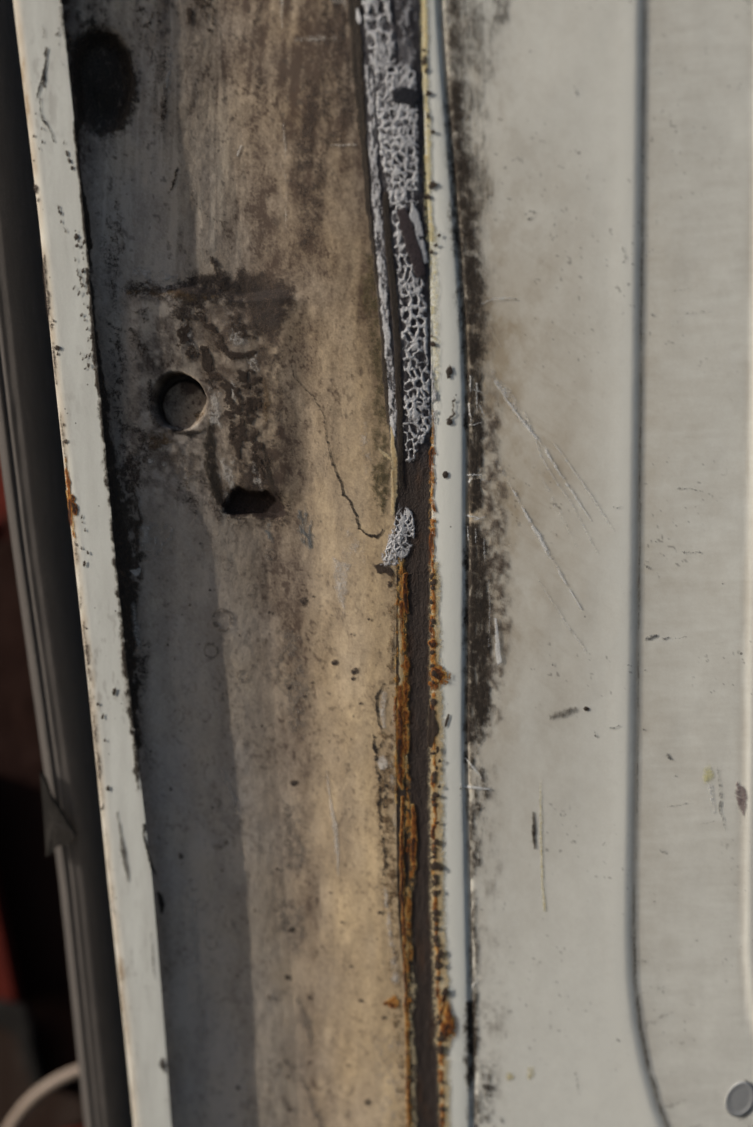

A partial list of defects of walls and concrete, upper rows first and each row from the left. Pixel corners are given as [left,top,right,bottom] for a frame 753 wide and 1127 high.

spalling [392,86,421,109]
spalling [396,207,426,278]
corrosion [60,424,78,538]
damp [60,0,296,789]
crack [291,355,415,566]
damp [444,0,510,1127]
corrosion [375,411,458,1127]